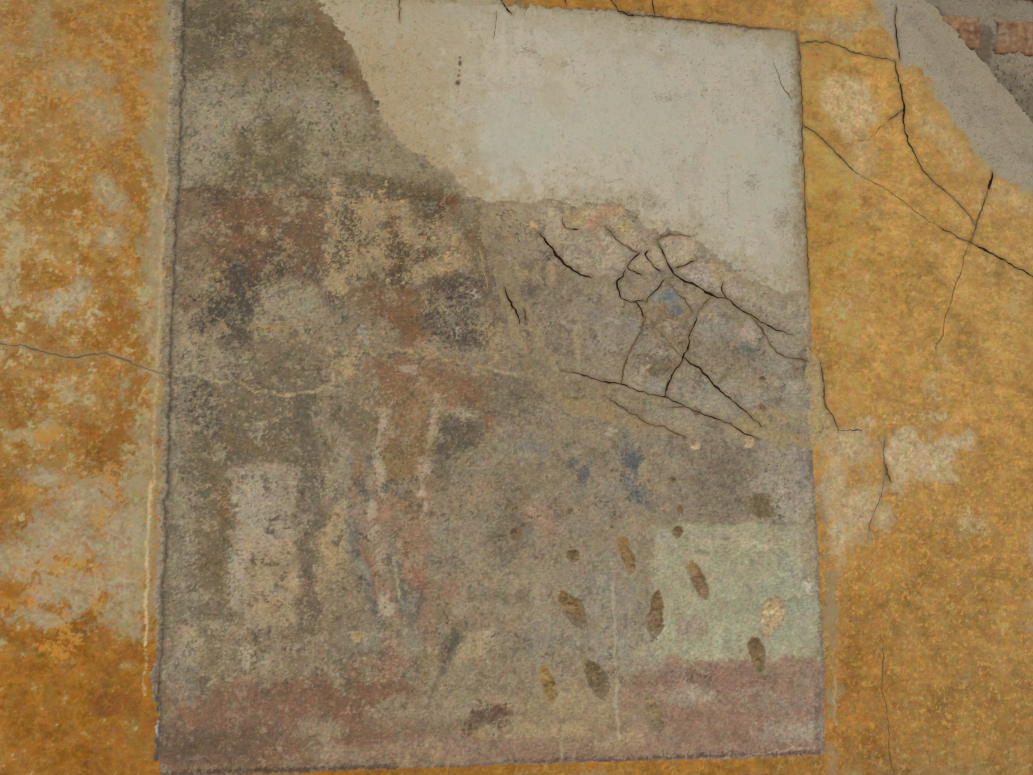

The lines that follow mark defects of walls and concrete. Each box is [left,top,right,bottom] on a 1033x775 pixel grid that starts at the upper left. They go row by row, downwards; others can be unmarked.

crack [611,0,768,29]
spalling [318,0,810,398]
crack [772,7,1033,357]
crack [539,217,591,278]
crack [479,246,527,324]
crack [0,343,168,375]
crack [566,226,892,538]
spalling [566,549,580,563]
spalling [672,526,684,538]